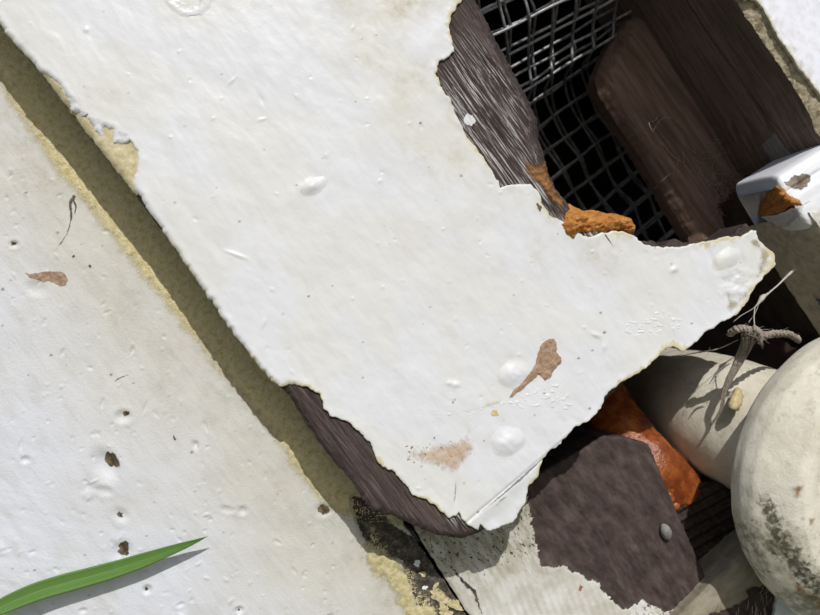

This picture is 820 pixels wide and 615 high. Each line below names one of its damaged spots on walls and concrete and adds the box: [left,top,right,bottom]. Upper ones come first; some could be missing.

peeling [42,73,138,195]
spalling [475,0,680,242]
spalling [403,520,469,615]